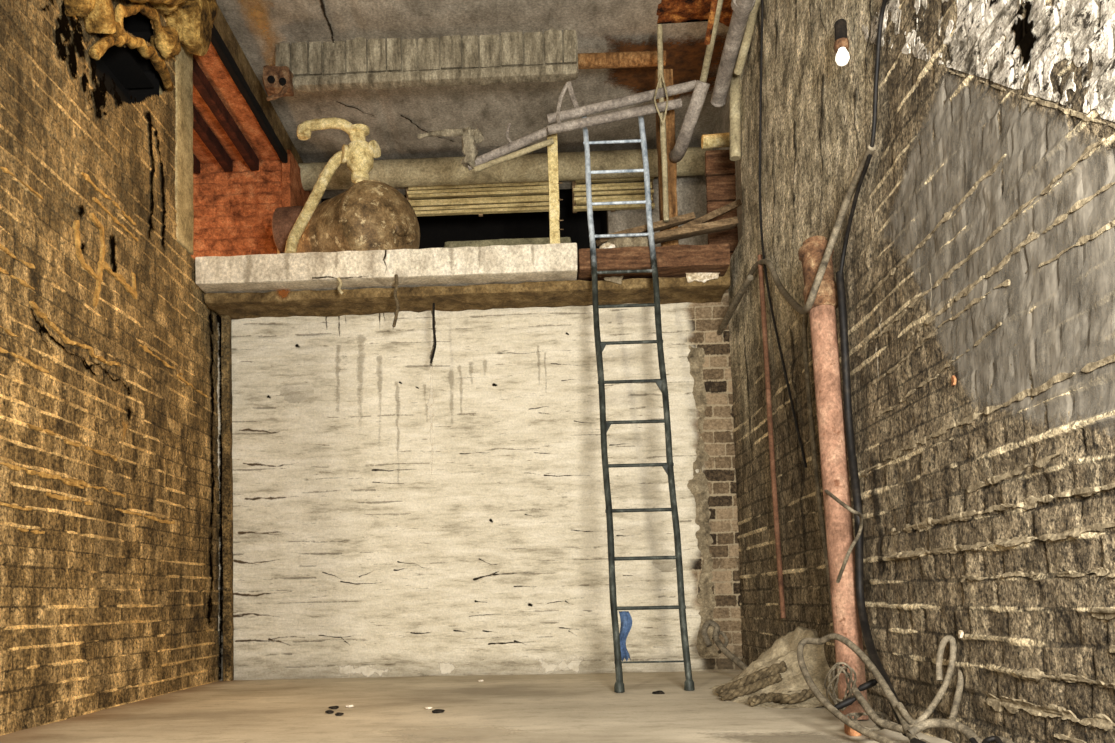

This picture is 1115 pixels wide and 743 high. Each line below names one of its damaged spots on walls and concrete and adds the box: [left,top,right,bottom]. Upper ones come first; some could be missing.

crack [320,0,335,43]
corrosion [606,0,726,99]
peeling [862,0,1115,122]
crack [146,110,166,248]
spalling [687,345,720,658]